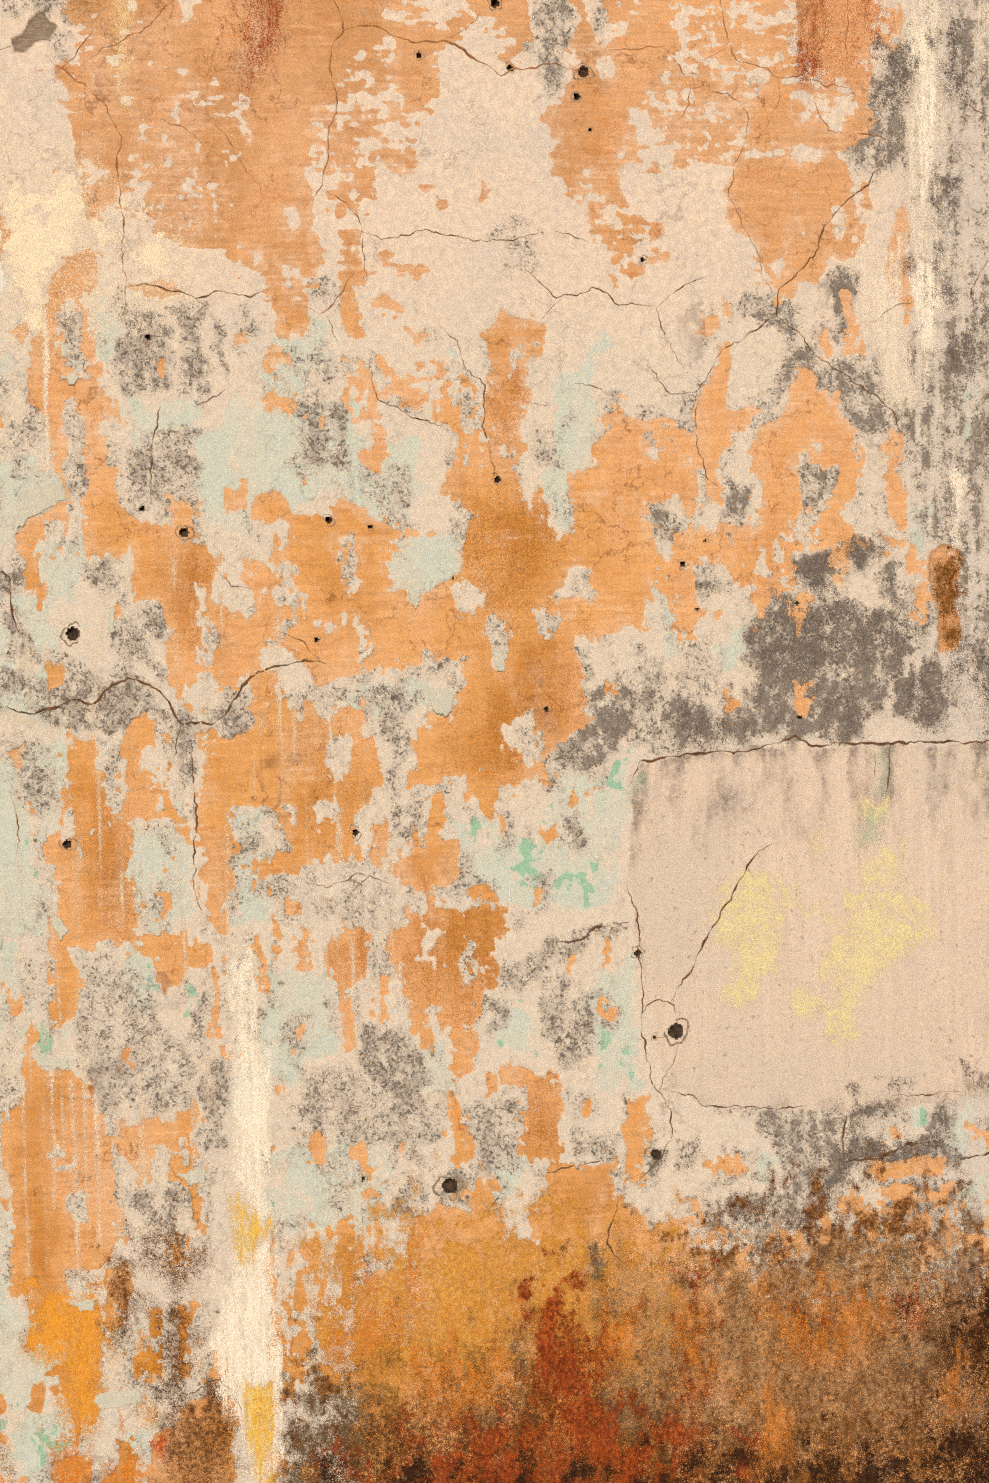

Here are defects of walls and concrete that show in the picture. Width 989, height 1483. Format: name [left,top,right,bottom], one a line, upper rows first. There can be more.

peeling [0,0,327,420]
rust [219,0,306,102]
crack [50,0,901,498]
peeling [400,0,641,245]
rust [784,0,895,94]
water stain [839,0,989,414]
water stain [666,411,989,761]
peeling [12,249,962,1483]
water stain [0,527,989,1483]
rust [281,1150,939,1483]
crack [548,844,808,1263]
crack [842,1114,989,1162]